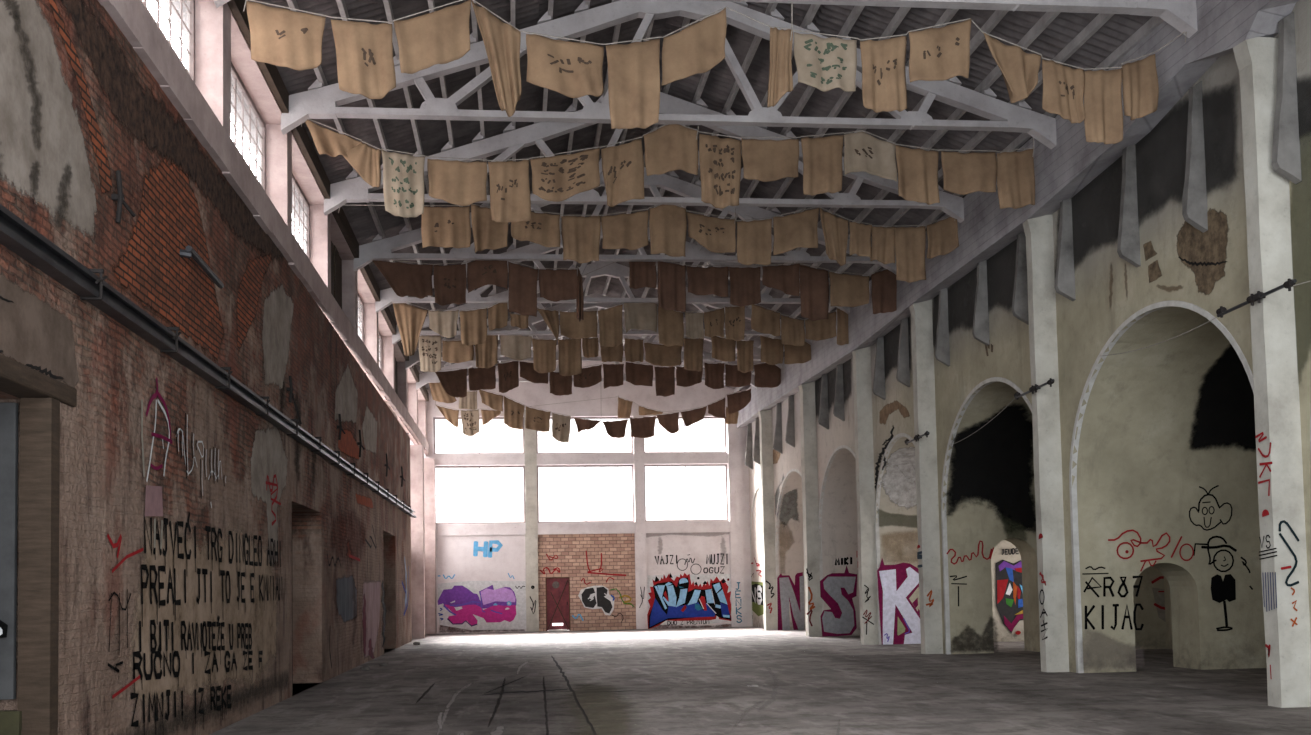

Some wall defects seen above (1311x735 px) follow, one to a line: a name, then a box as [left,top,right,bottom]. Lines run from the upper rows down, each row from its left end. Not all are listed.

flaking render [1143,241,1162,283]
flaking render [1176,208,1229,295]